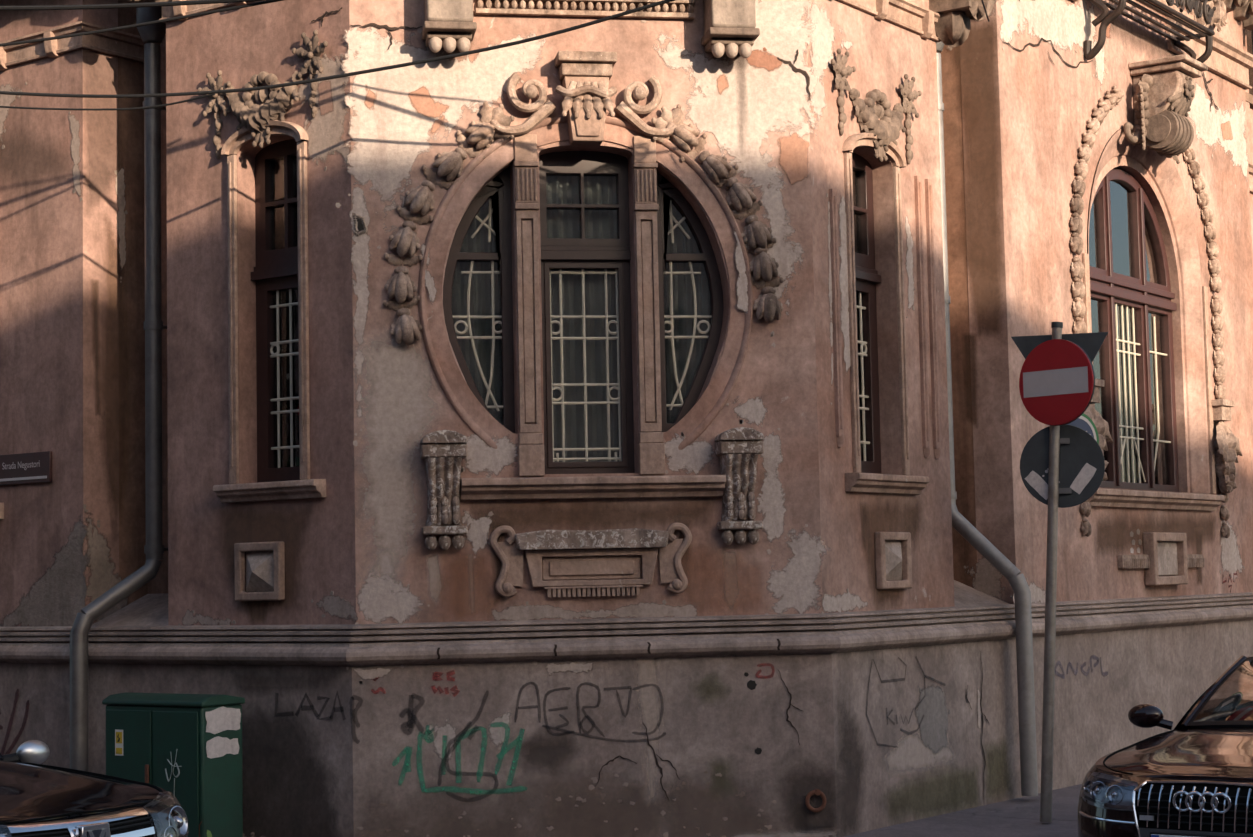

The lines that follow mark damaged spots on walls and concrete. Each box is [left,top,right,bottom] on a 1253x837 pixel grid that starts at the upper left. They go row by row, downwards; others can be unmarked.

flaking render [972,0,1111,90]
crack [1004,38,1093,68]
flaking render [655,0,853,315]
flaking render [1187,83,1248,181]
flaking render [297,26,546,446]
flaking render [727,397,868,615]
flaking render [355,569,430,624]
crack [777,639,802,745]
crack [595,723,679,800]